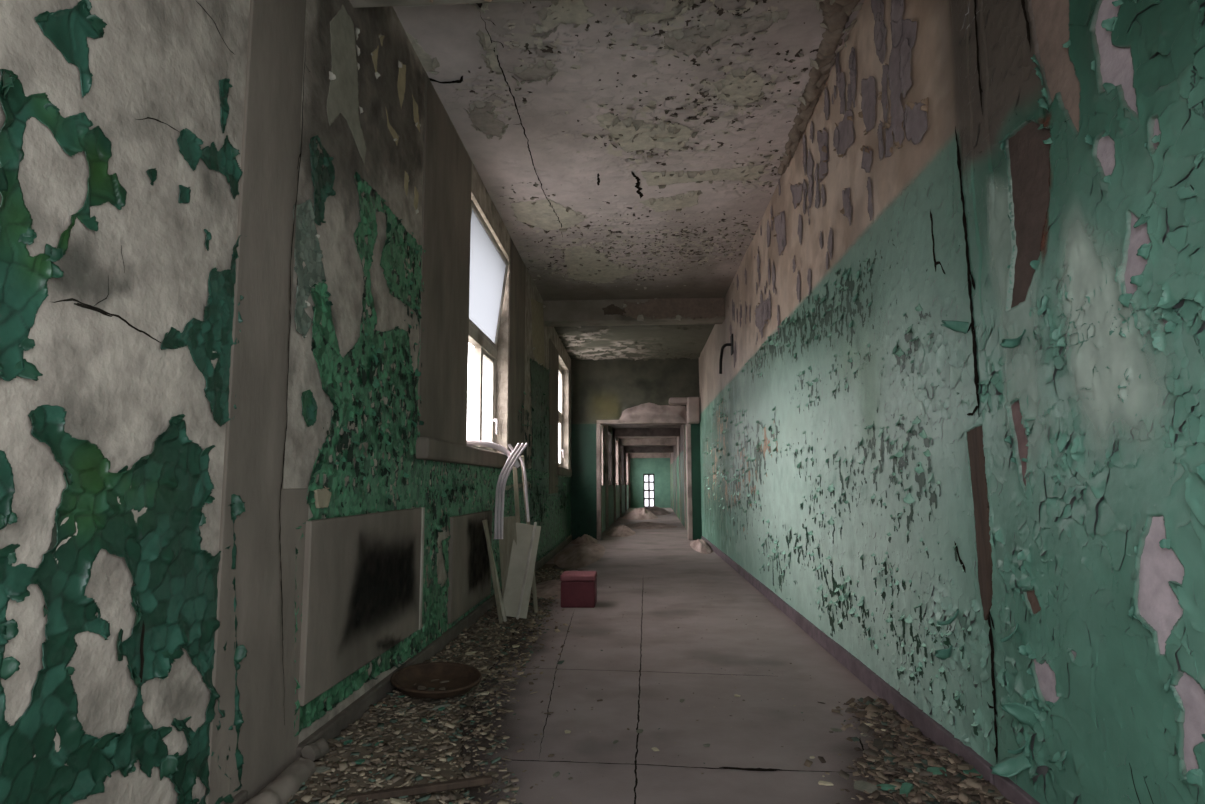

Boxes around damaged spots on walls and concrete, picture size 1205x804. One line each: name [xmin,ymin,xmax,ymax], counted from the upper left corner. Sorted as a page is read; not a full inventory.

peeling [0,0,127,381]
crack [53,245,161,343]
peeling [160,235,244,427]
peeling [177,78,243,199]
peeling [293,5,575,737]
crack [429,76,463,84]
crack [480,14,563,239]
flaking render [998,0,1115,308]
peeling [0,405,248,804]
crack [719,765,782,773]
spalling [702,388,978,736]
crack [987,610,998,762]